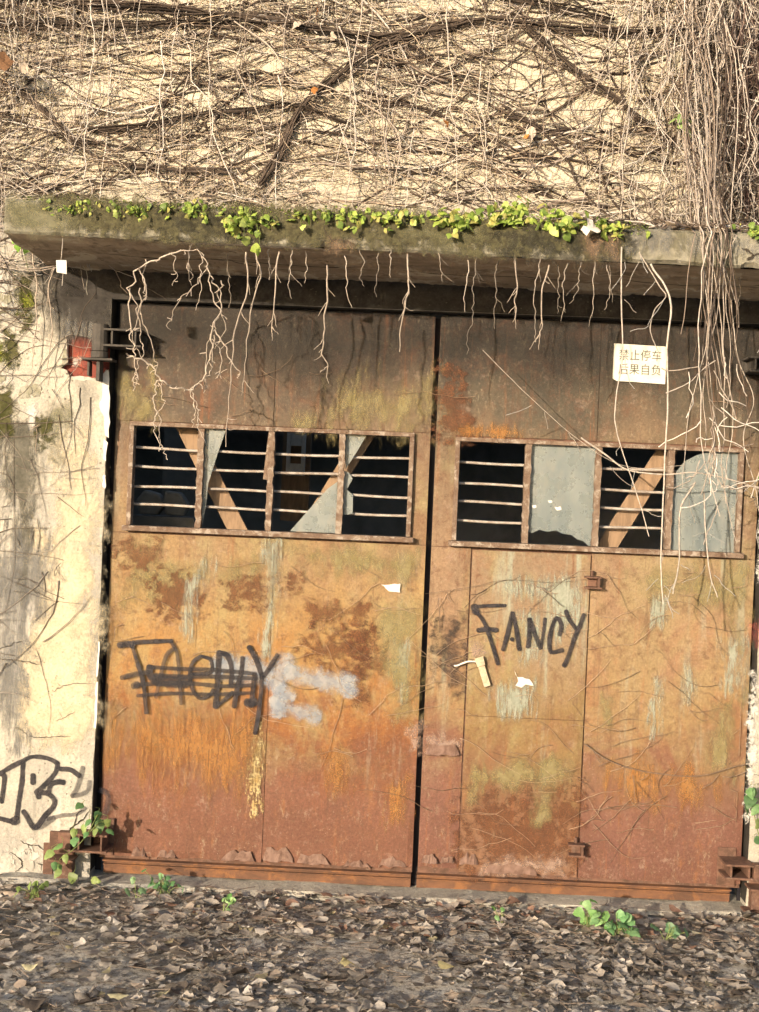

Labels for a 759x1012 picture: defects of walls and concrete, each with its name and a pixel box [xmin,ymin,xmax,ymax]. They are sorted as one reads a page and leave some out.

corrosion [430,361,517,445]
corrosion [111,535,206,625]
corrosion [219,574,269,613]
corrosion [280,572,305,594]
corrosion [294,598,391,707]
corrosion [106,708,265,819]
corrosion [605,763,702,810]
corrosion [449,771,587,882]
peeling [221,847,329,865]
peeling [344,856,406,868]
peeling [422,853,537,876]